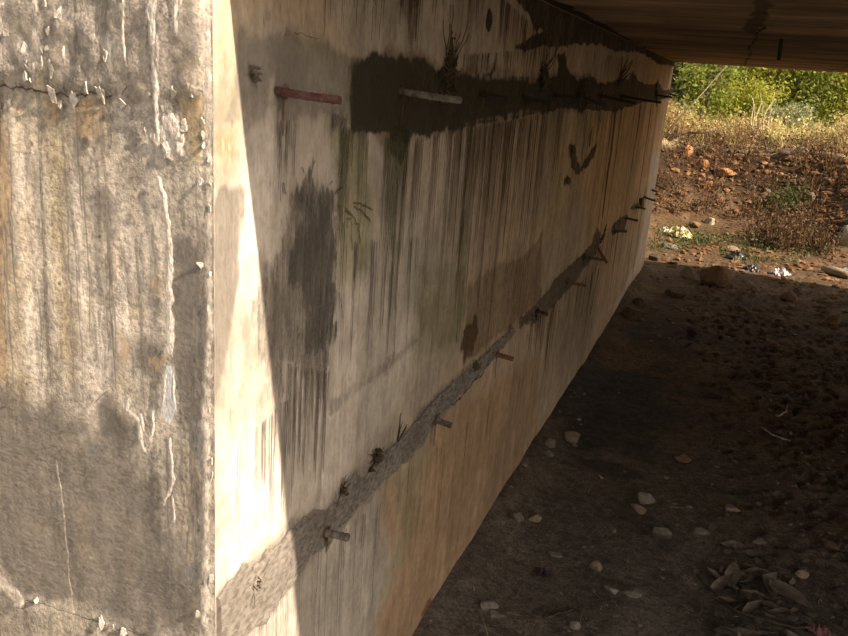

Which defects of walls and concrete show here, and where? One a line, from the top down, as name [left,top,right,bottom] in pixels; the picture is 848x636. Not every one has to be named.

crack [0,83,127,110]
leakage [145,0,162,141]
leakage [172,0,182,36]
leakage [253,0,674,508]
leakage [0,92,244,635]
crack [2,591,145,636]